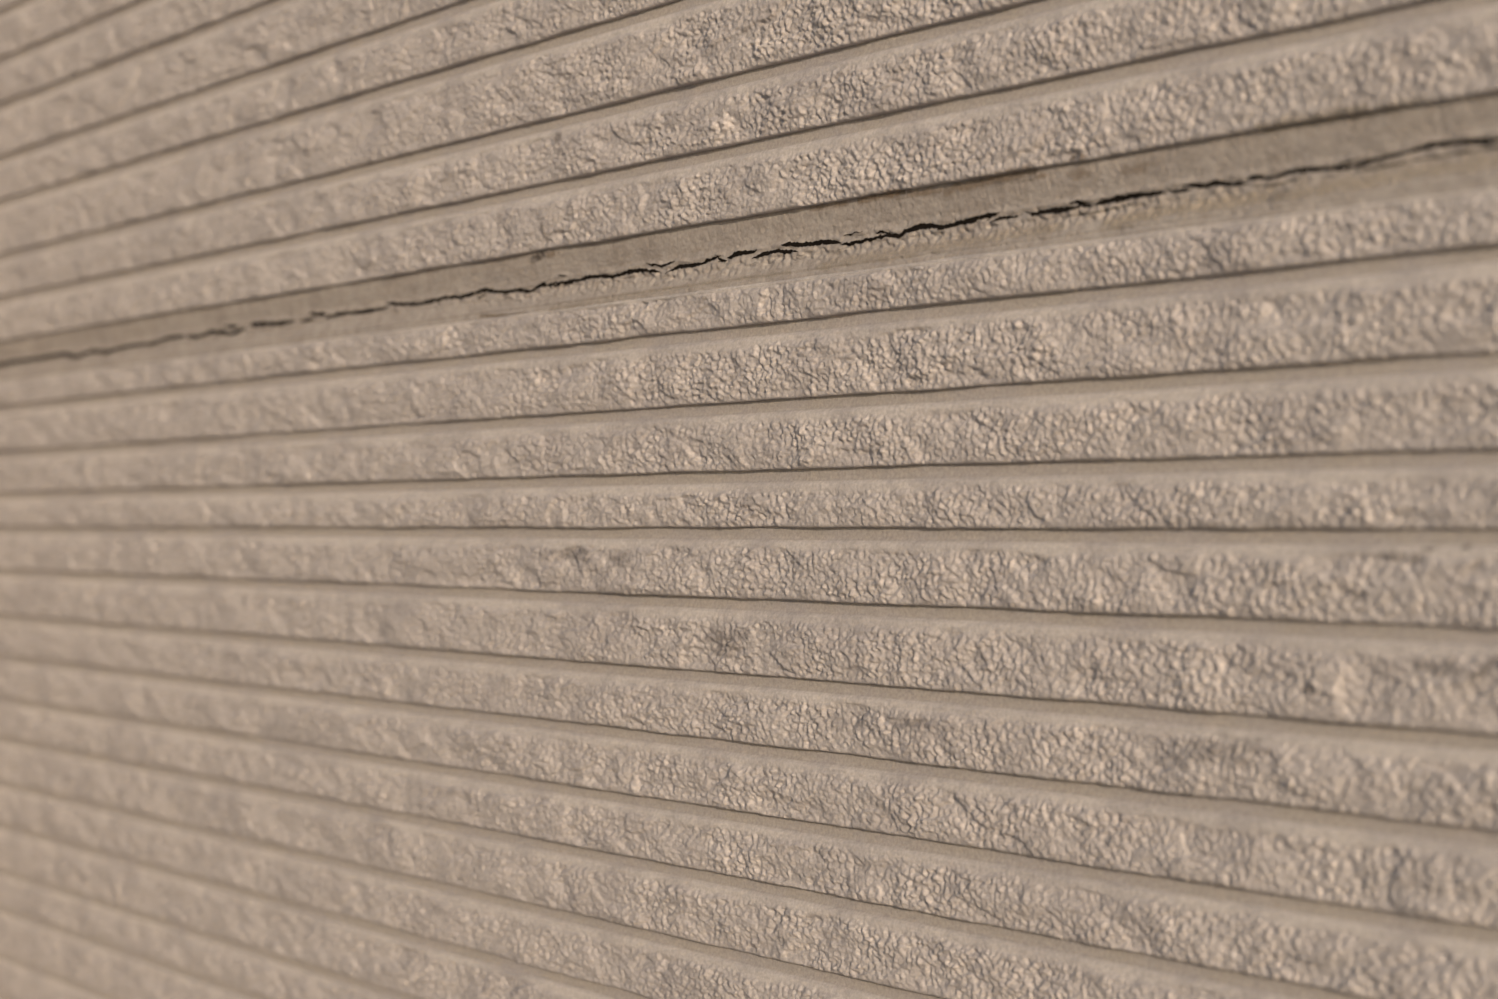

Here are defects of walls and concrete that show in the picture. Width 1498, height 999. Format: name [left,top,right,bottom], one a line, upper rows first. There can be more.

crack [0,137,1498,367]